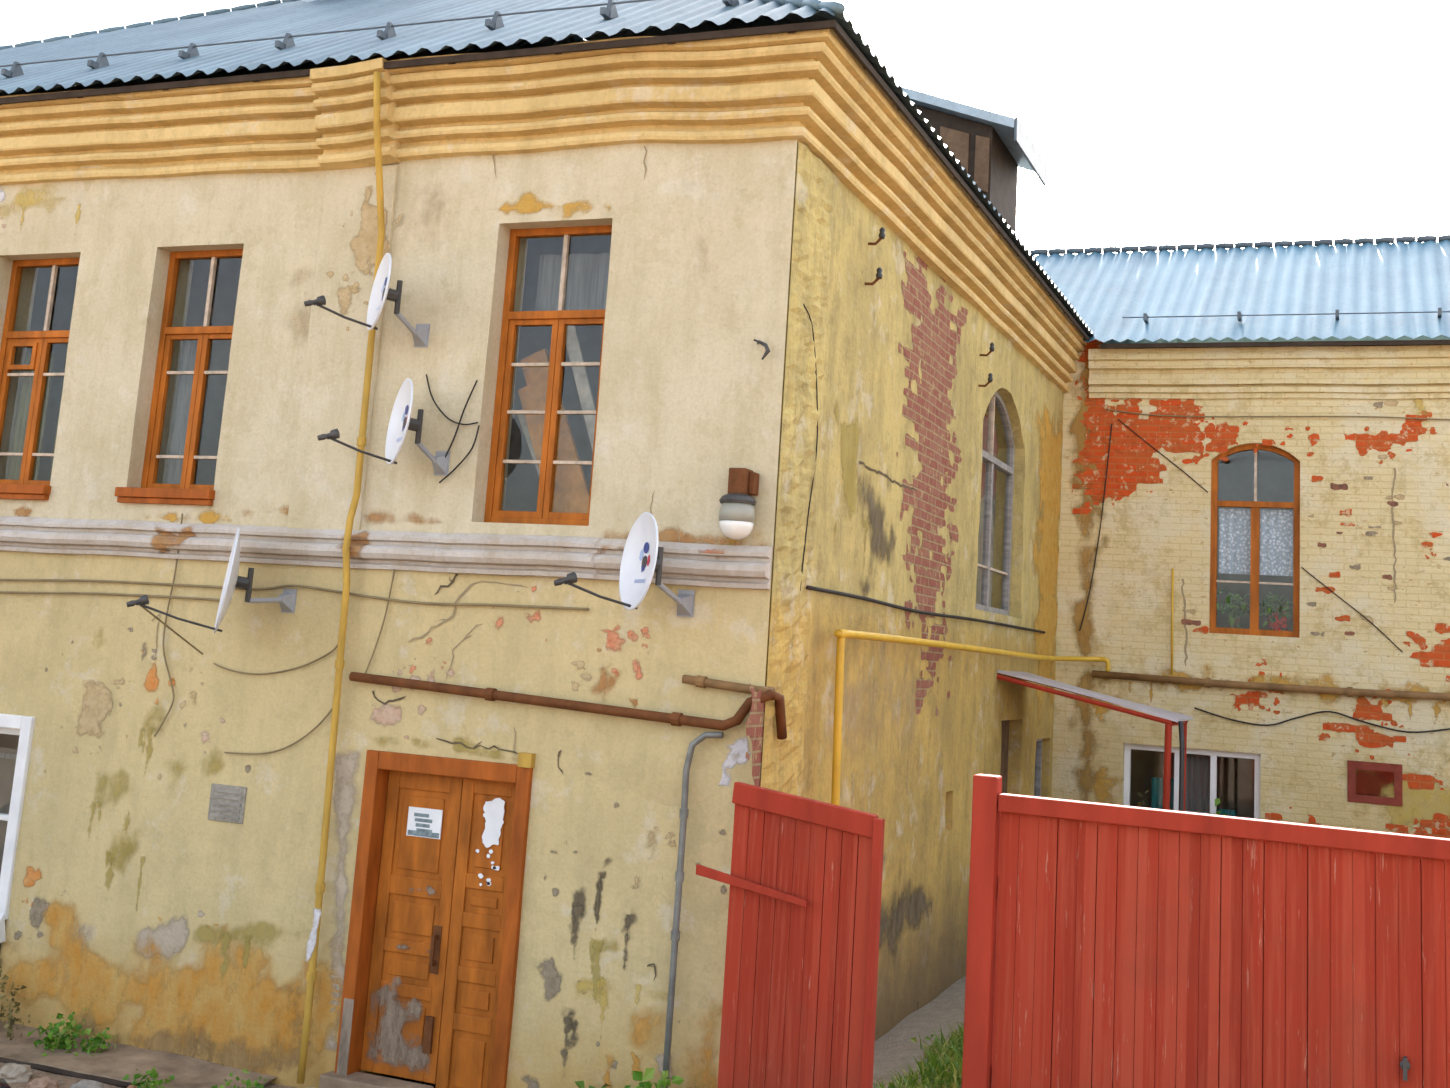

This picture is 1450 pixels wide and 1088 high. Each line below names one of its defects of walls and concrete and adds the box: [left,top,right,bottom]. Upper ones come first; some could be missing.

flaking render [1072,339,1320,515]
flaking render [1344,401,1437,480]
flaking render [897,251,969,716]
spalling [1311,475,1348,490]
crack [408,574,529,678]
flaking render [1403,623,1450,682]
flaking render [1318,689,1410,760]
flaking render [1402,773,1444,790]
flaking render [1386,813,1450,839]
damp [4,752,359,1074]
damp [571,872,607,1020]
damp [561,1017,578,1065]